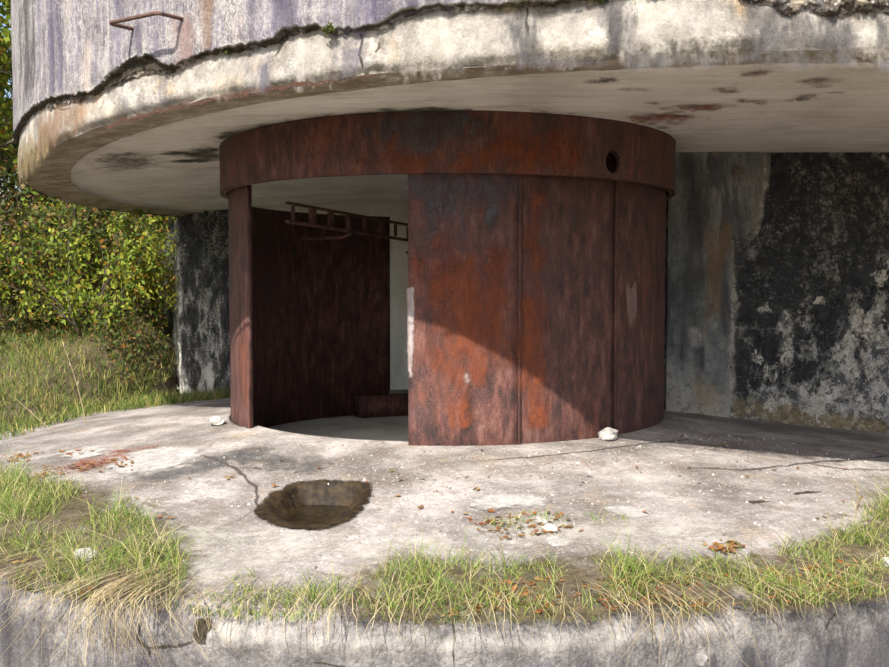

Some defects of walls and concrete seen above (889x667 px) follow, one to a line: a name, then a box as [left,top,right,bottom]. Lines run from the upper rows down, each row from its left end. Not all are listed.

spalling [743,0,889,19]
leakage [19,0,62,93]
rust [673,104,731,112]
leakage [722,152,889,404]
leakage [164,209,231,397]
rust [61,449,129,470]
crack [474,437,720,462]
crack [690,455,889,470]
crack [202,455,264,519]